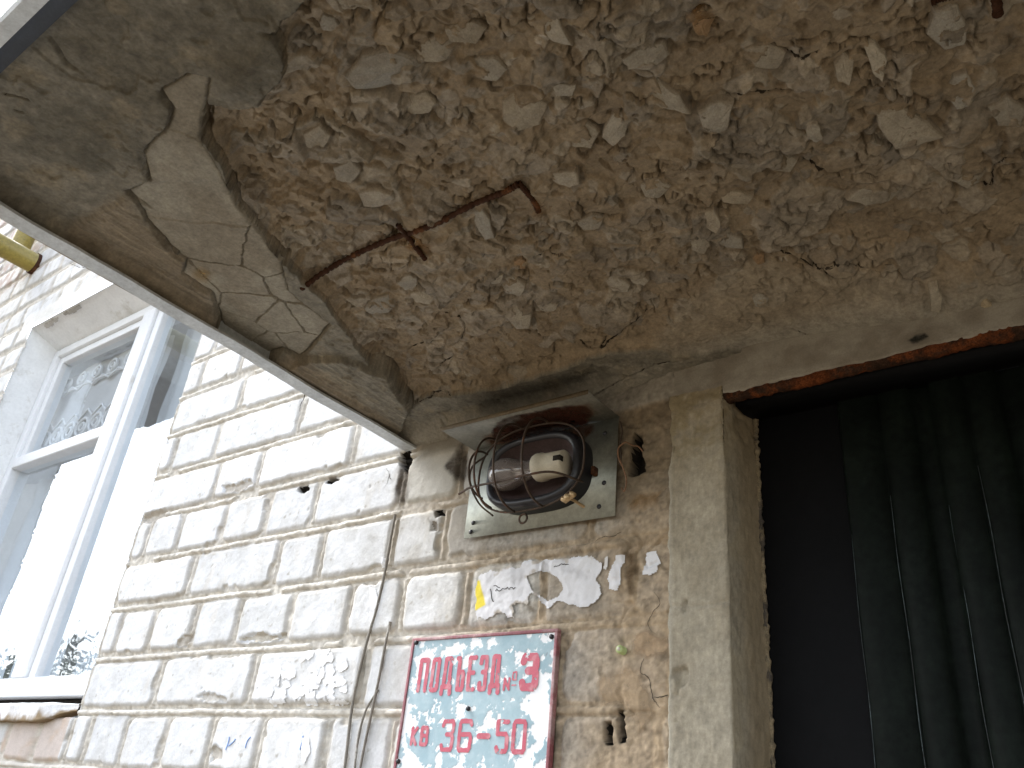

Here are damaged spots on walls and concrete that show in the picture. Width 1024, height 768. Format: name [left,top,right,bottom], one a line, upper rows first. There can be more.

spalling [131,0,1024,400]
peeling [263,649,350,707]